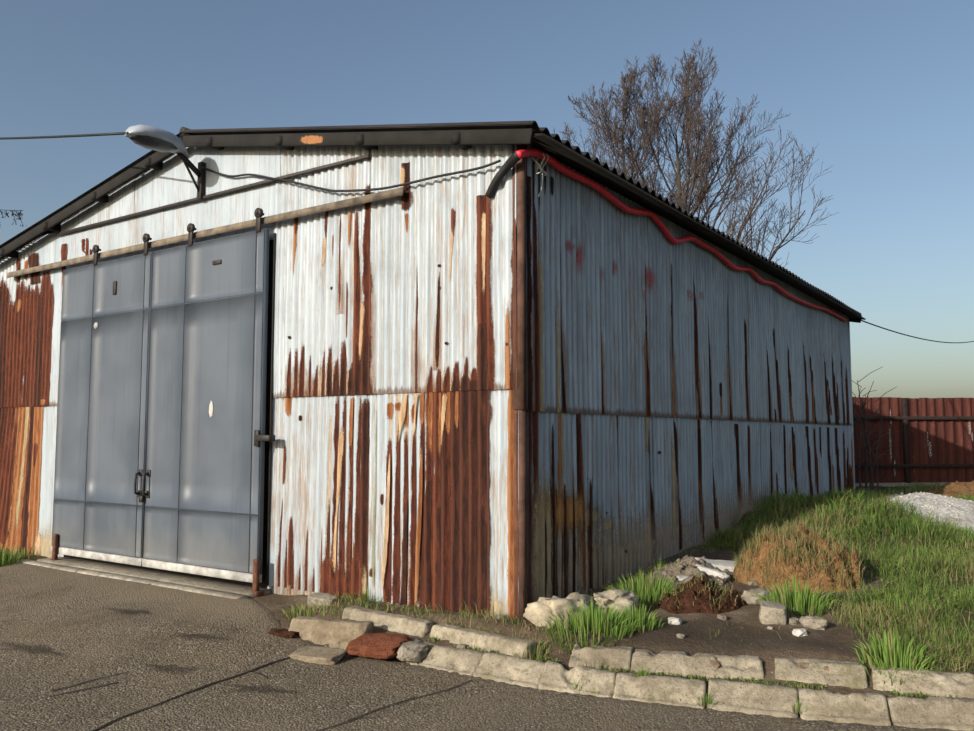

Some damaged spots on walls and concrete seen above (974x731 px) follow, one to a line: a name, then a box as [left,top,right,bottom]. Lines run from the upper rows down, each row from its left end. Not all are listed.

rust [81,238,92,256]
rust [400,161,413,232]
rust [0,244,67,556]
rust [278,176,656,620]
rust [644,264,682,550]
rust [693,276,751,542]